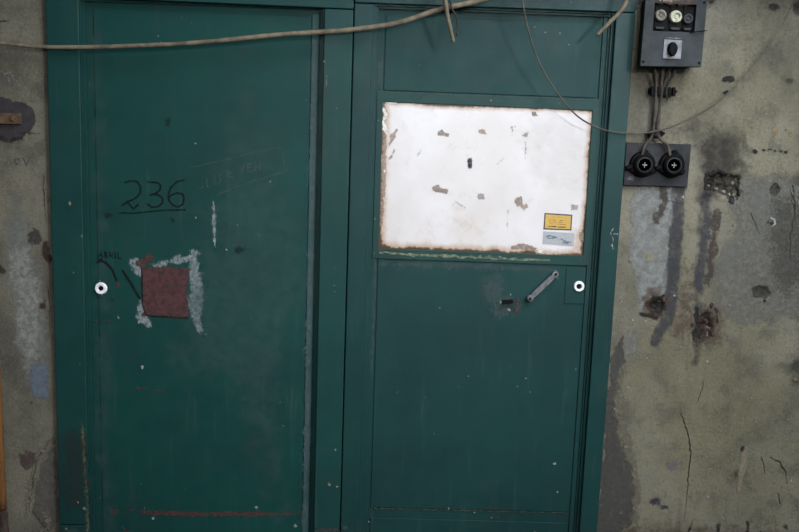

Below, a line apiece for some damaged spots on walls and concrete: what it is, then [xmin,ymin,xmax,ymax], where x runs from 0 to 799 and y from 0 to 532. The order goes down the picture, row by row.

damp [651,187,686,346]
damp [695,193,722,294]
crack [681,412,693,532]